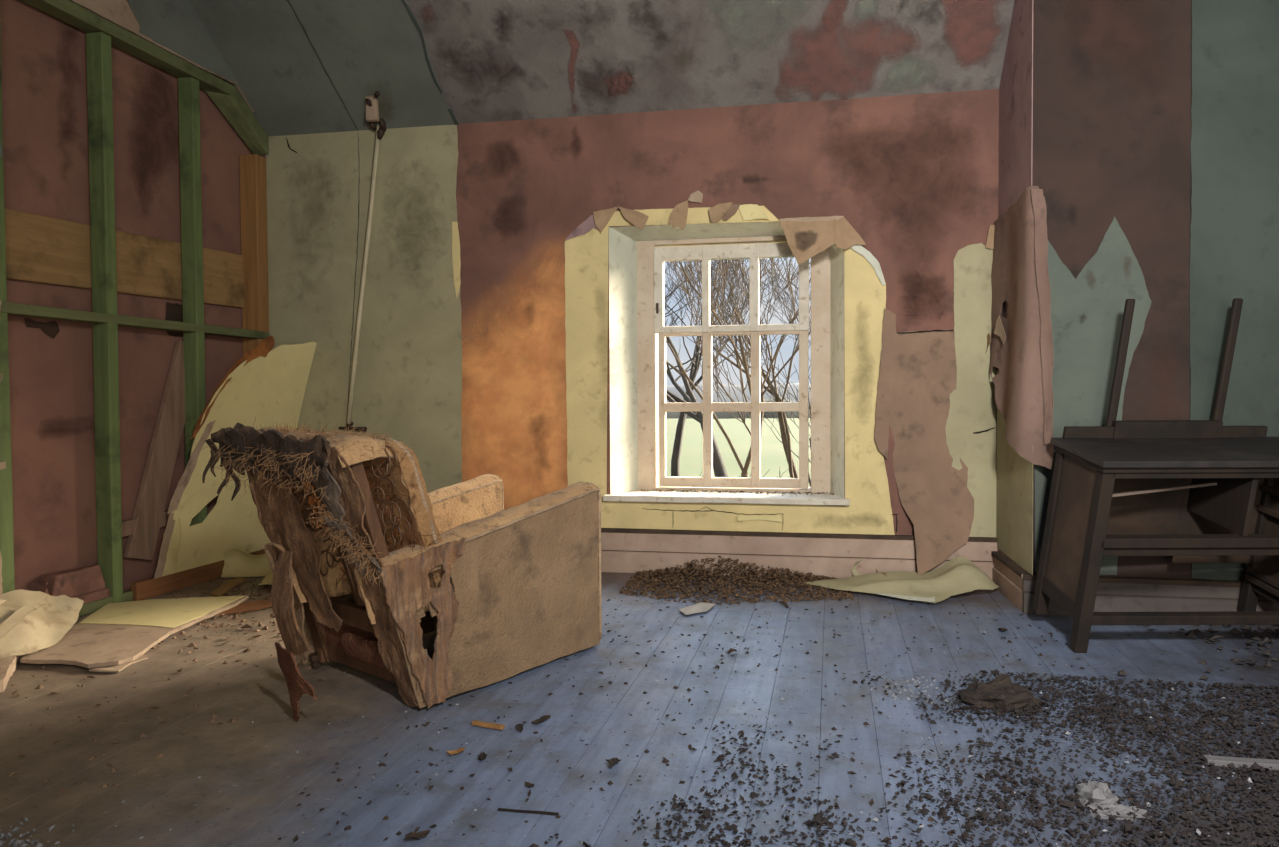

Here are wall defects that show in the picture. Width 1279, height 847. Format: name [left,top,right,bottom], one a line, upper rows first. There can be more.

peeling [985,316,1006,354]